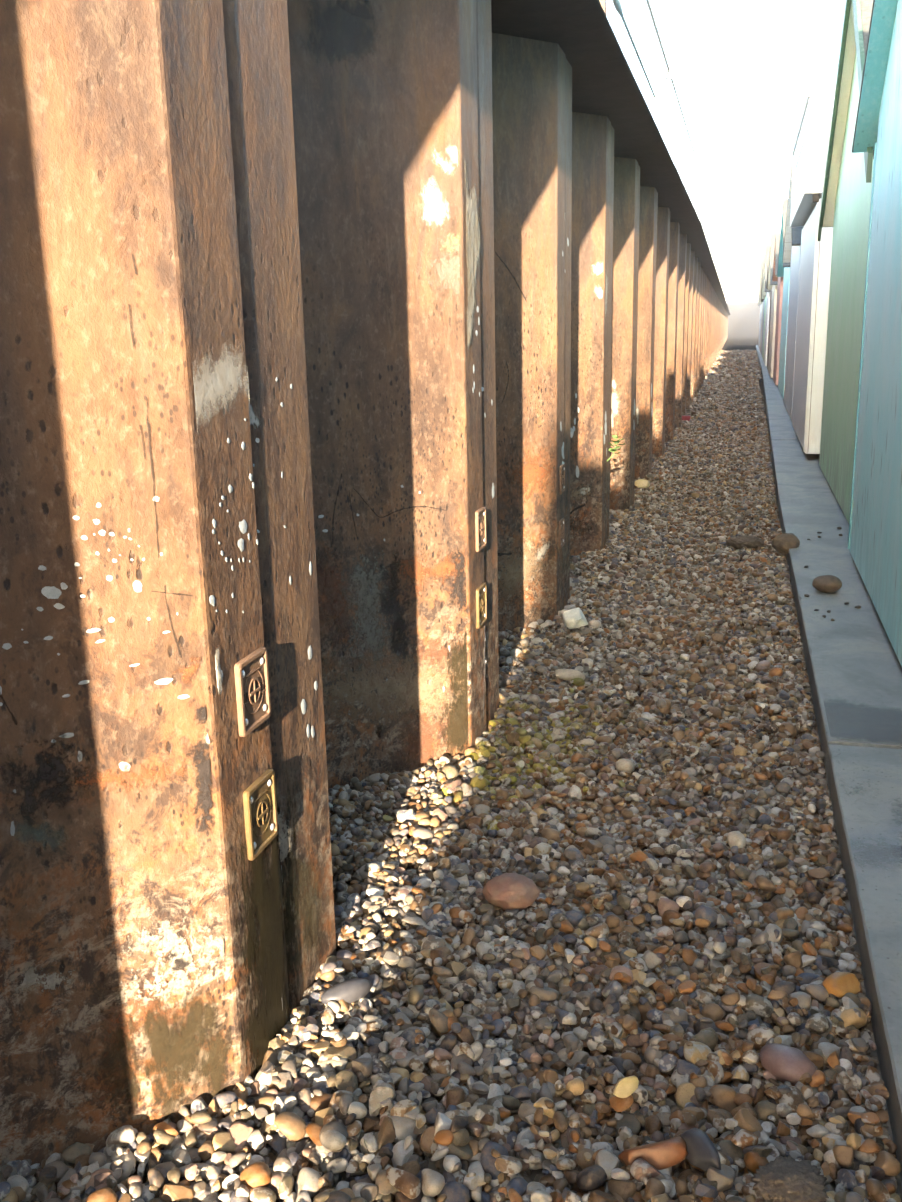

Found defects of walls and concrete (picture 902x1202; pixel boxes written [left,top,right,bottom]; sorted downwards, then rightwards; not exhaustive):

damp [196,706,207,724]
damp [2,733,90,826]
damp [186,741,214,832]
damp [103,776,308,1119]